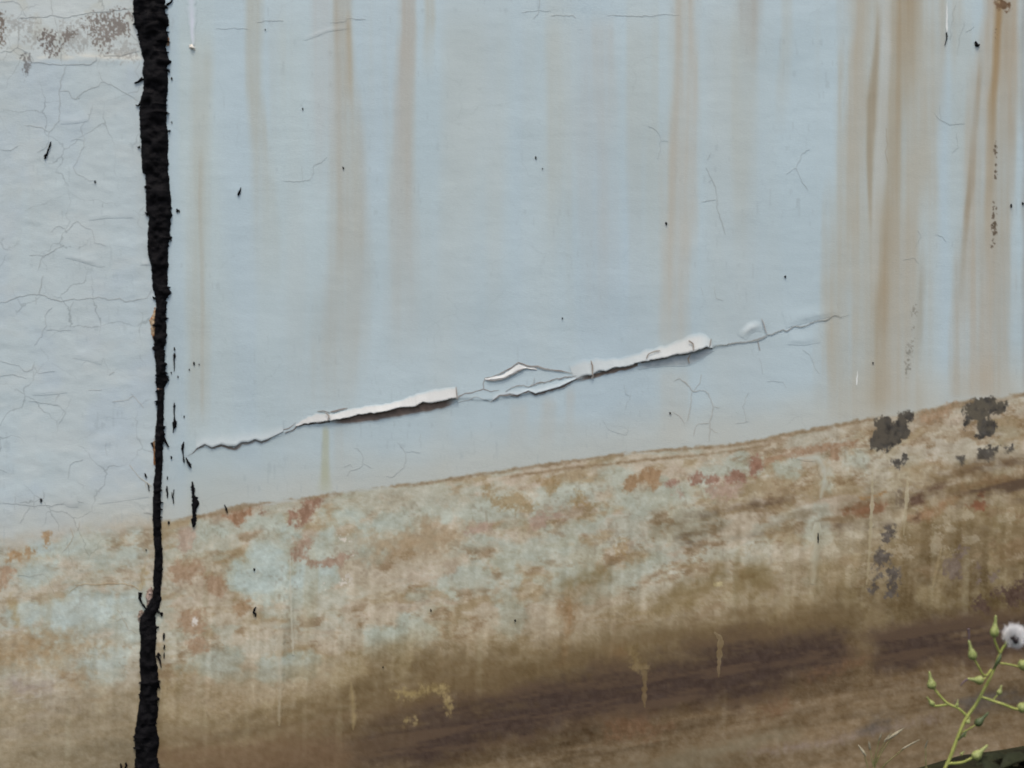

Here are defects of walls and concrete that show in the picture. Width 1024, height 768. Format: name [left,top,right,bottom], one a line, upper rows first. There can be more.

crack [0,0,139,181]
crack [0,211,152,427]
rust [165,0,1024,662]
water stain [655,365,695,448]
water stain [157,385,1024,768]